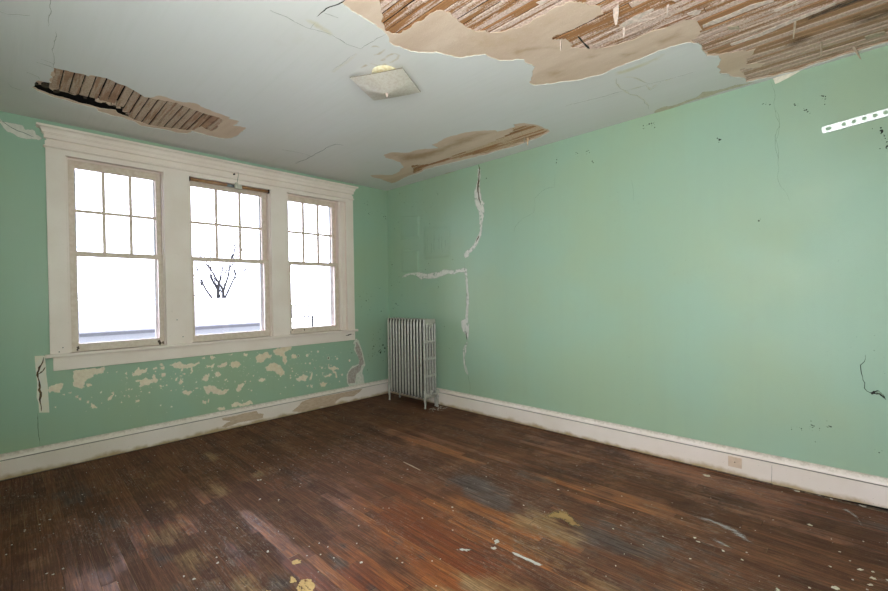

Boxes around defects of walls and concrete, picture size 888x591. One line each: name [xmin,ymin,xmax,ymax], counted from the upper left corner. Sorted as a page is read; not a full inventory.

spalling [379,0,888,113]
spalling [35,68,222,131]
spalling [412,125,547,173]
crack [461,167,485,394]
crack [36,357,45,441]
peeling [48,334,366,412]